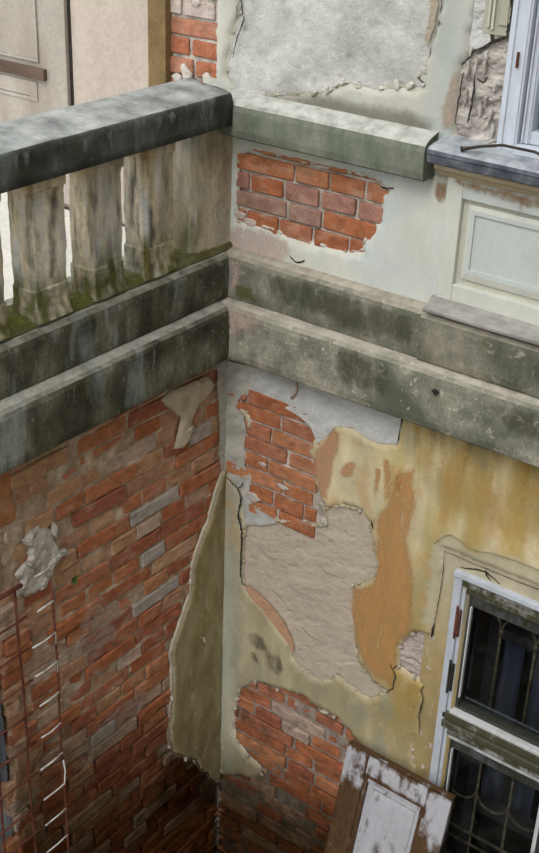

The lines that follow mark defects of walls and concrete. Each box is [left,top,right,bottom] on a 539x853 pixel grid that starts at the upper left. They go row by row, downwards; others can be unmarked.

crack [233,0,245,55]
flaking render [170,0,441,97]
spalling [464,0,495,139]
flaking render [233,149,390,253]
peeling [40,548,70,590]
crack [226,477,244,584]
flaking render [167,361,401,765]
crack [431,551,539,638]
flaking render [215,680,358,849]